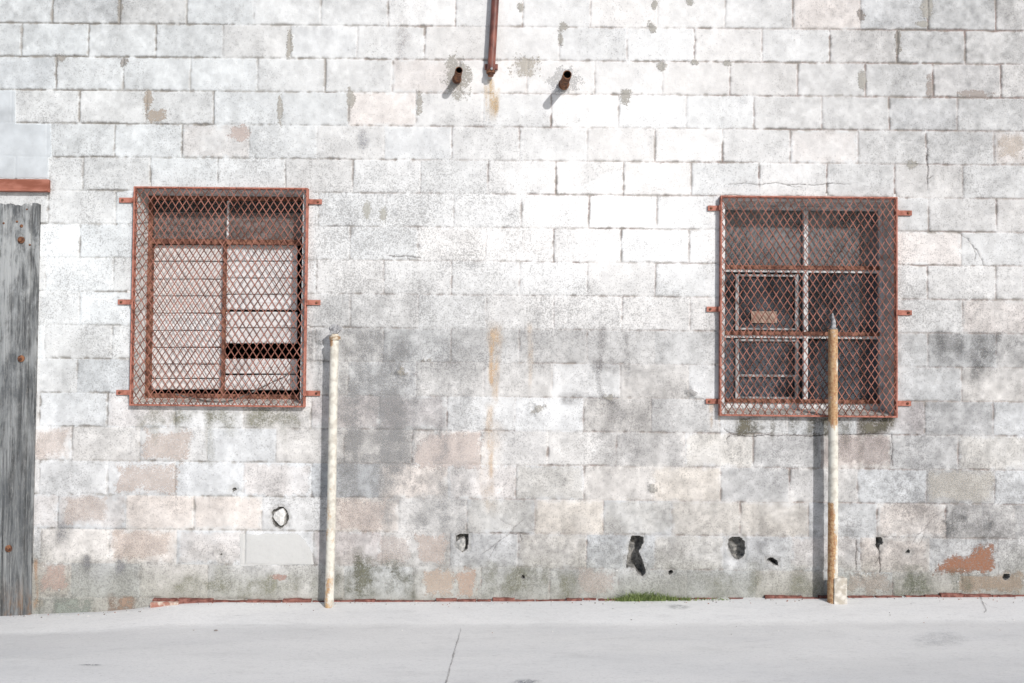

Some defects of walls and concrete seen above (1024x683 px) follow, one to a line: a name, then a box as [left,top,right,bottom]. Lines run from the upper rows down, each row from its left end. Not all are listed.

damp [736,418,755,435]
damp [859,415,895,435]
spalling [272,507,289,528]
spalling [455,533,469,552]
spalling [616,536,646,576]
spalling [727,537,746,559]
peeling [933,543,1010,582]